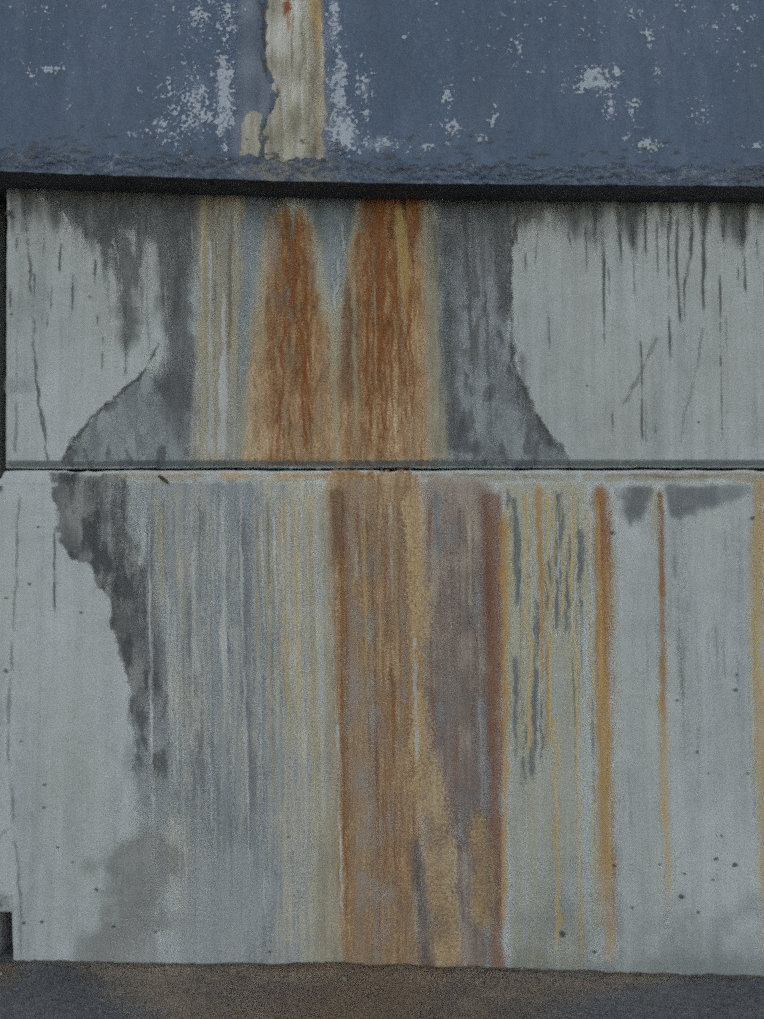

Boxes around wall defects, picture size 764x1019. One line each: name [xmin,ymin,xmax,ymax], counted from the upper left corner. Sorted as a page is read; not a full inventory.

crack [25,224,33,293]
crack [32,319,48,461]
corrosion [222,199,508,969]
spalling [0,0,764,186]
water stain [44,189,764,1019]
corrosion [595,488,614,905]
corrosion [752,482,764,882]